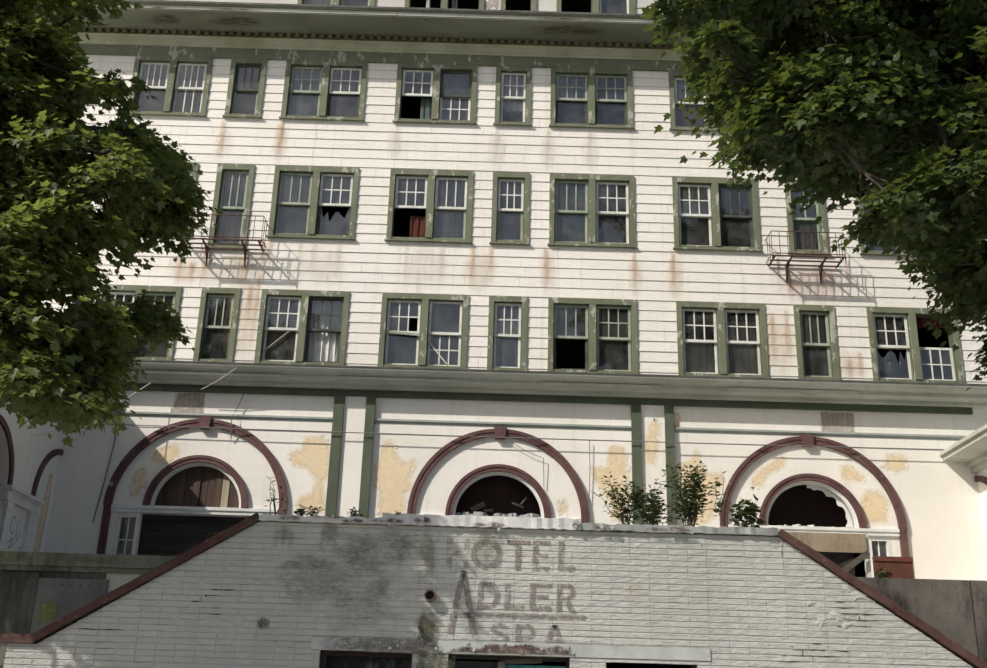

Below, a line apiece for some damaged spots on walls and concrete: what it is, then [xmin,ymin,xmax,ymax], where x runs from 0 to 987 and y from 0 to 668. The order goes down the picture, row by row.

peeling [153,445,179,465]
peeling [280,433,418,526]
peeling [592,446,631,530]
peeling [643,415,662,463]
peeling [839,465,891,524]
peeling [882,455,908,475]